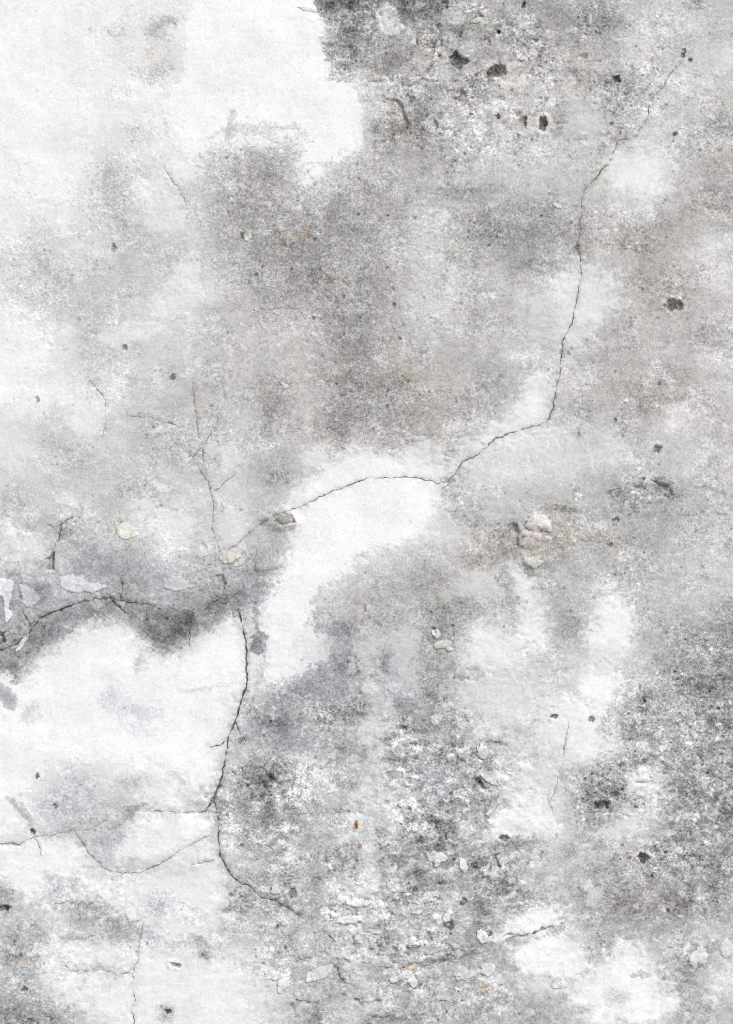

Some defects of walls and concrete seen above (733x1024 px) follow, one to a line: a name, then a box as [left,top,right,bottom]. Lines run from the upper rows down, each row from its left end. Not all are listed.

water stain [313,0,473,83]
water stain [484,10,544,35]
water stain [590,60,674,121]
water stain [181,104,583,462]
crack [89,63,681,575]
crack [49,517,73,565]
water stain [543,486,637,563]
crack [0,580,150,651]
crack [0,598,334,940]
water stain [0,516,733,1024]
crack [547,722,569,810]
crack [335,965,390,1018]